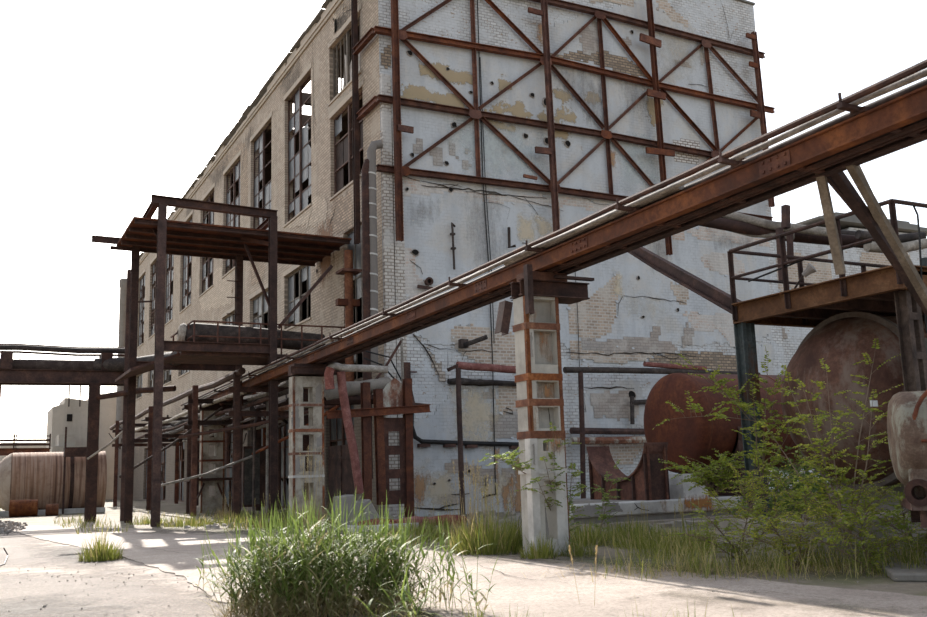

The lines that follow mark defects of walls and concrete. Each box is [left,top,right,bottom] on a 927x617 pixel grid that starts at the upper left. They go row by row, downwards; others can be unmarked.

flaking render [567,274,737,371]